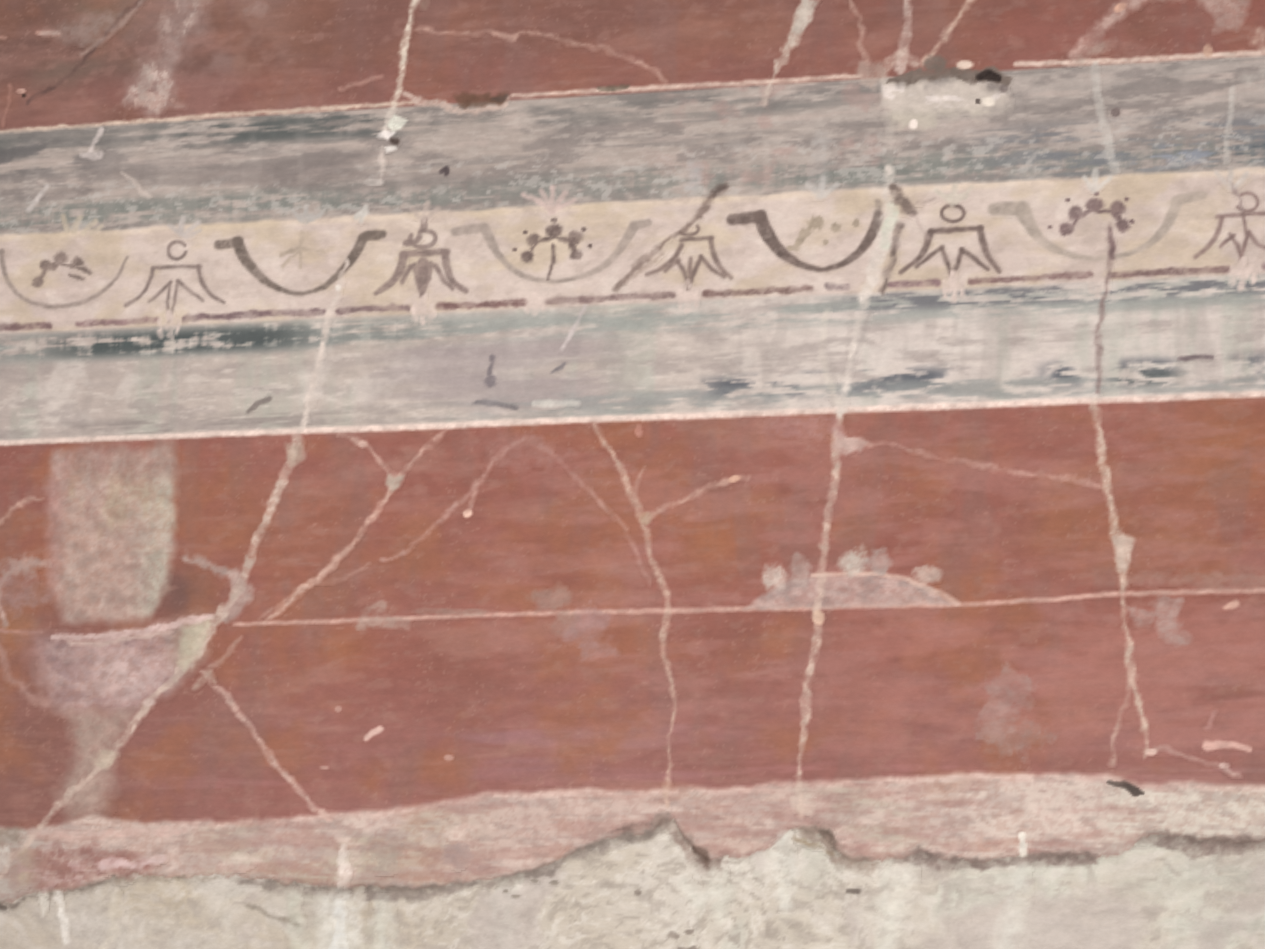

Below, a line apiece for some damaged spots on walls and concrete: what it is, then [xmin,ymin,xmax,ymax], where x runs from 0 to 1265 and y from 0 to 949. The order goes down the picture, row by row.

crack [0,0,149,130]
crack [363,0,669,187]
flaking render [867,52,1017,141]
crack [611,180,732,294]
crack [759,0,1265,879]
crack [0,254,752,926]
spalling [0,768,1265,949]